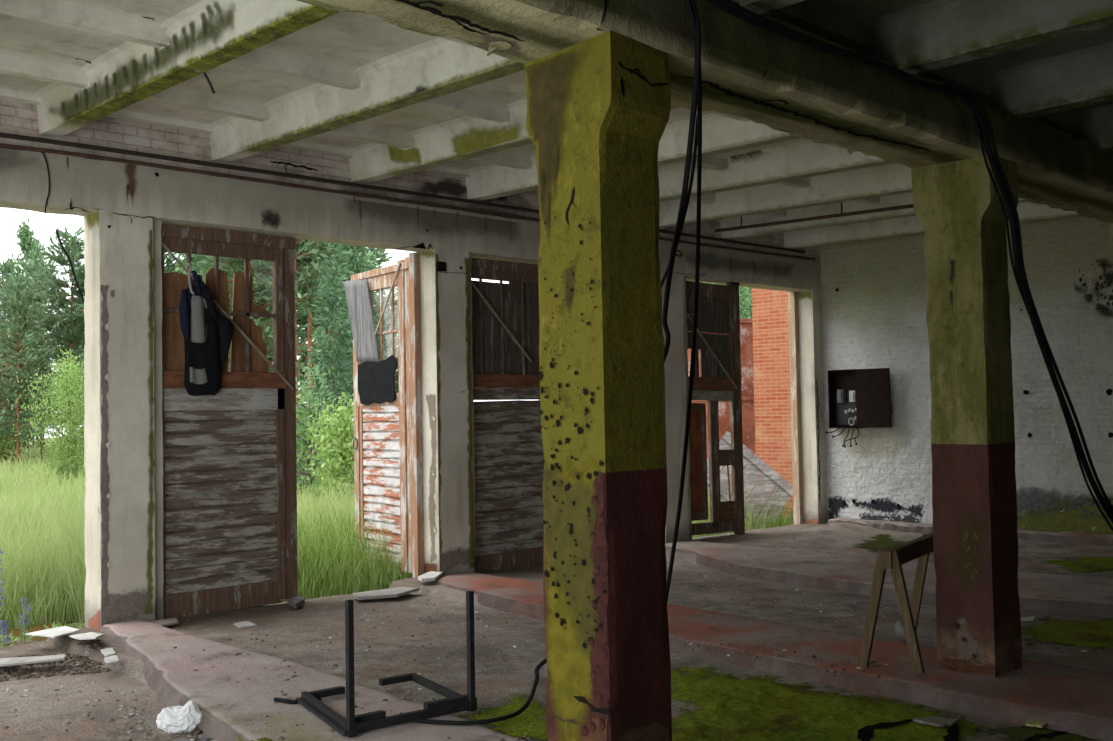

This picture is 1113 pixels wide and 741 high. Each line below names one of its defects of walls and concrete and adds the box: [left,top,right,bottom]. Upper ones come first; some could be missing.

crack [395,0,525,42]
crack [597,0,607,31]
damp [53,3,233,121]
crack [617,61,935,152]
damp [1075,260,1113,317]
crack [857,719,913,741]
crack [943,724,959,741]
crack [1024,731,1067,741]